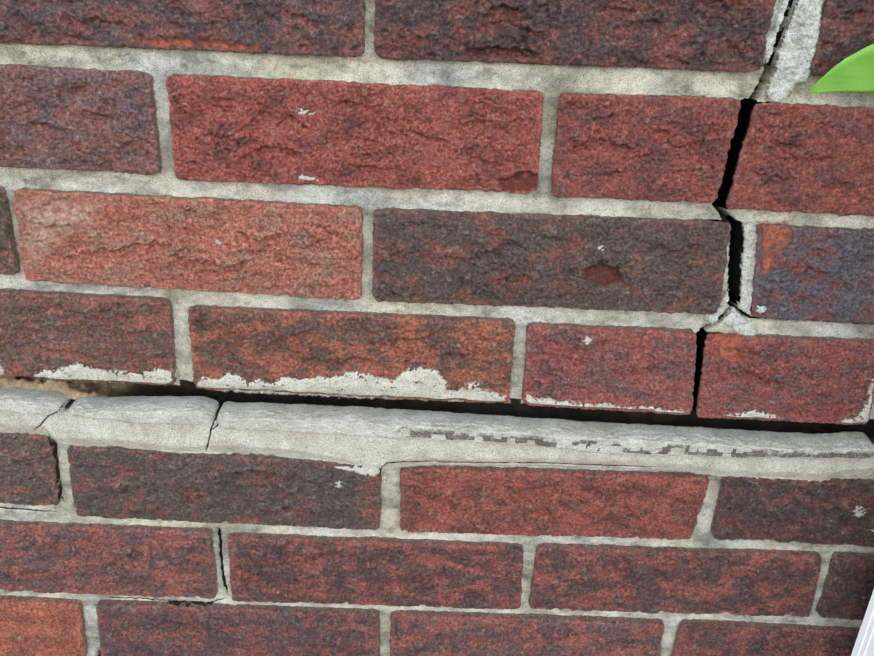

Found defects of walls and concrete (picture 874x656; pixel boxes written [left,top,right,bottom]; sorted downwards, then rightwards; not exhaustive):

crack [754,0,793,90]
crack [712,202,780,320]
crack [0,376,874,512]